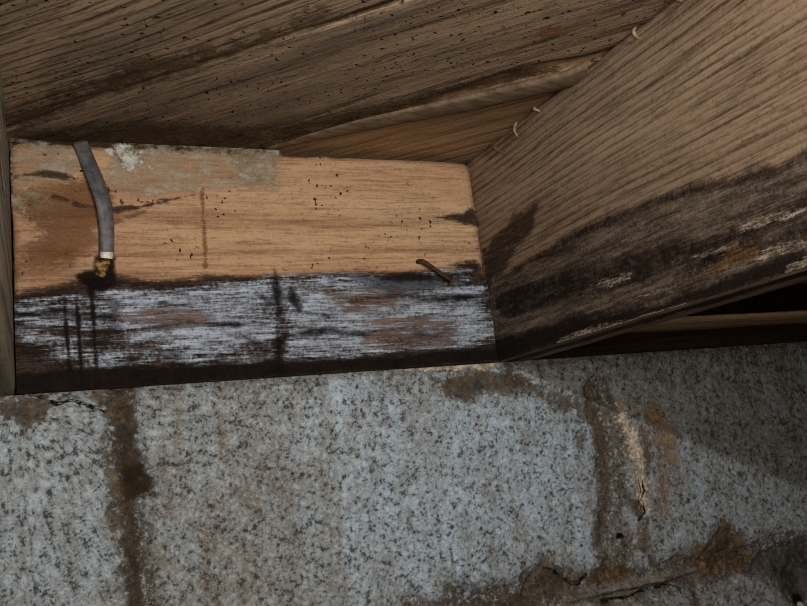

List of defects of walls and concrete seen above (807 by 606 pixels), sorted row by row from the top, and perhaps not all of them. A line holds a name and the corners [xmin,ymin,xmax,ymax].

water stain [5,29,560,150]
water stain [0,149,807,606]
crack [542,567,588,586]
crack [600,583,682,603]